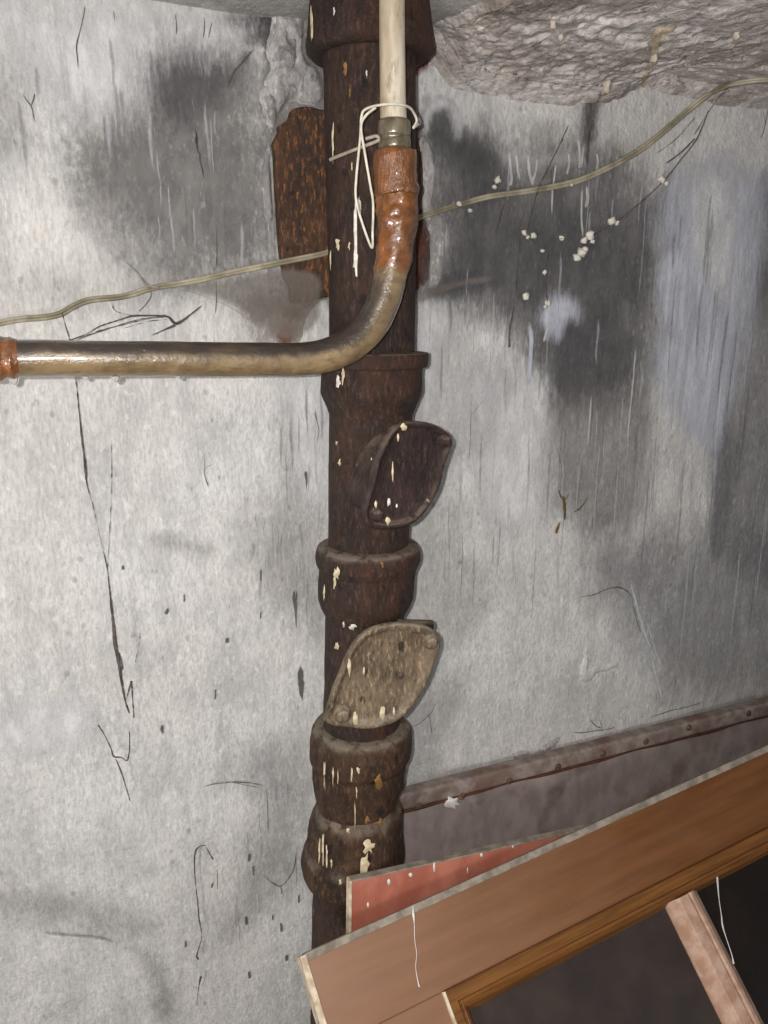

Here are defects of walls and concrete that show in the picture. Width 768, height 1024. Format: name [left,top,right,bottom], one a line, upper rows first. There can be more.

damp [1,0,277,278]
spalling [226,14,324,222]
damp [415,98,766,596]